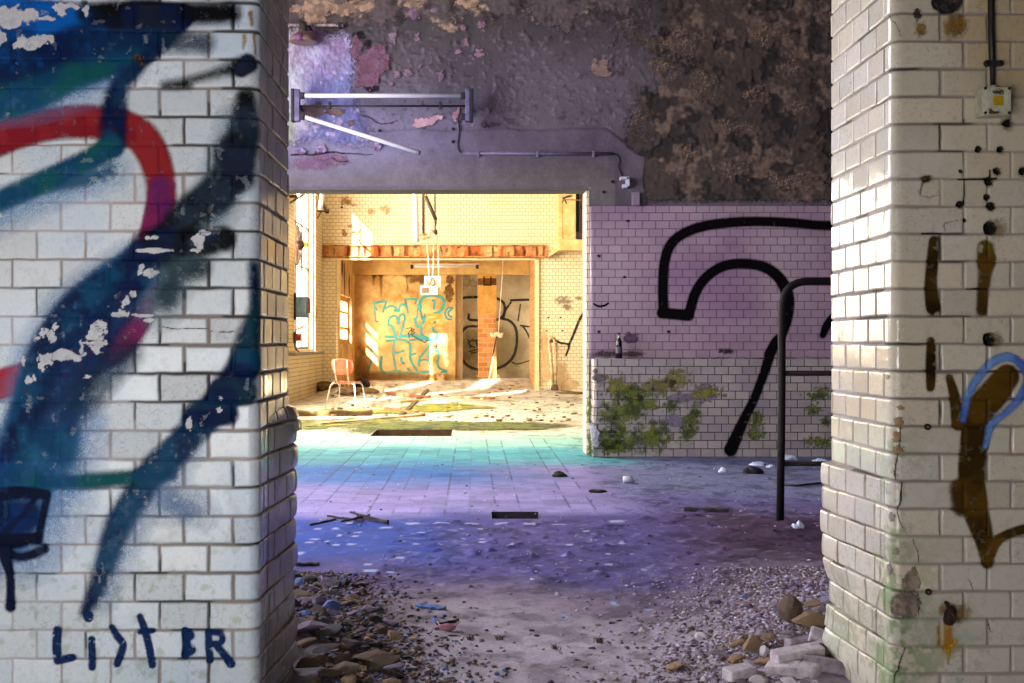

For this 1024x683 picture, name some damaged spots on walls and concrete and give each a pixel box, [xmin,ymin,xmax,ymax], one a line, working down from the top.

peeling [0,2,89,51]
peeling [287,0,833,203]
peeling [135,235,173,278]
peeling [190,230,212,253]
peeling [20,291,155,384]
crack [894,427,919,563]
spalling [887,548,922,618]
crack [894,642,906,682]
rust [937,605,968,663]